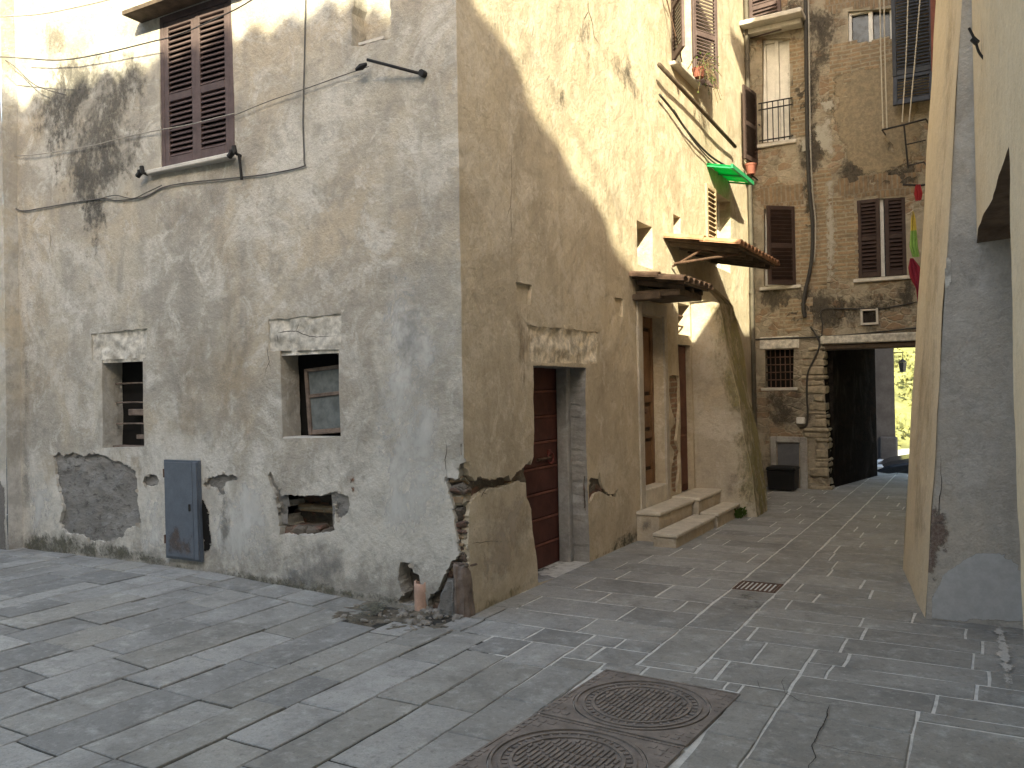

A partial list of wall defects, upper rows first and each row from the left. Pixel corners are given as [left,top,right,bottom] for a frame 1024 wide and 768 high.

leakage [36,30,145,246]
flaking render [55,447,159,542]
flaking render [202,472,238,551]
spalling [270,473,350,535]
flaking render [400,444,526,618]
flaking render [583,469,619,511]
crack [739,680,907,768]